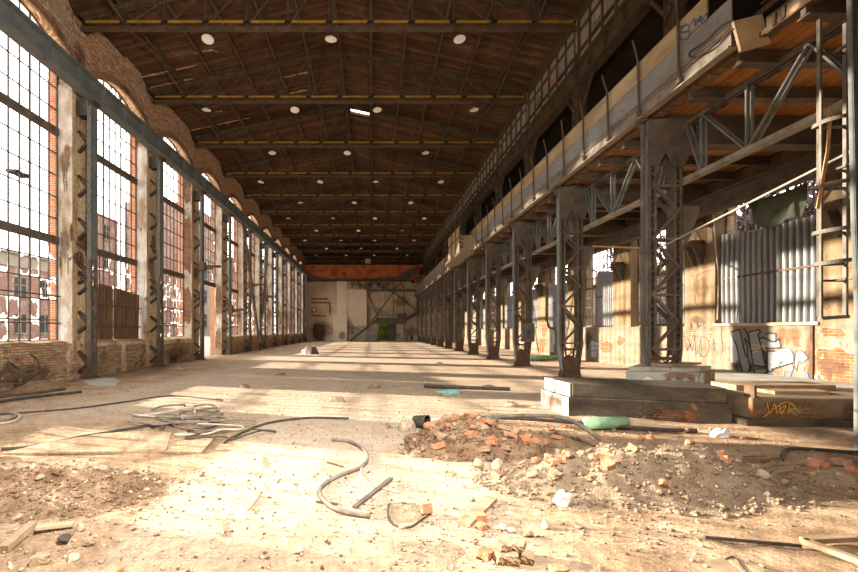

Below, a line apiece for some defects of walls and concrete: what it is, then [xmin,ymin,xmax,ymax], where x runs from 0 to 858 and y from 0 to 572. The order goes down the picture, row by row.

spalling [814,327,854,384]
corrosion [659,410,696,423]